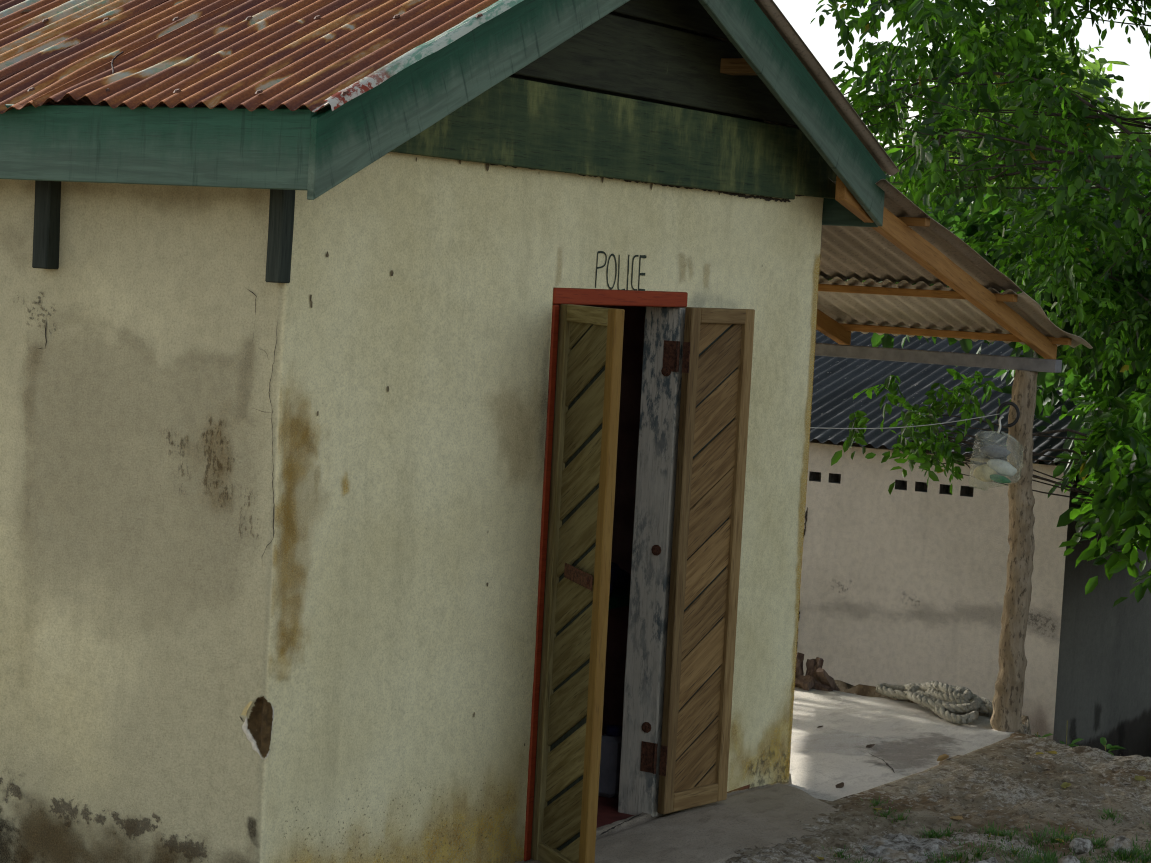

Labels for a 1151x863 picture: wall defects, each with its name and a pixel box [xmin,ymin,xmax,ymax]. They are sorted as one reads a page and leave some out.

crack [247,289,278,556]
spalling [239,696,274,760]
water stain [0,777,191,863]
water stain [248,818,256,838]